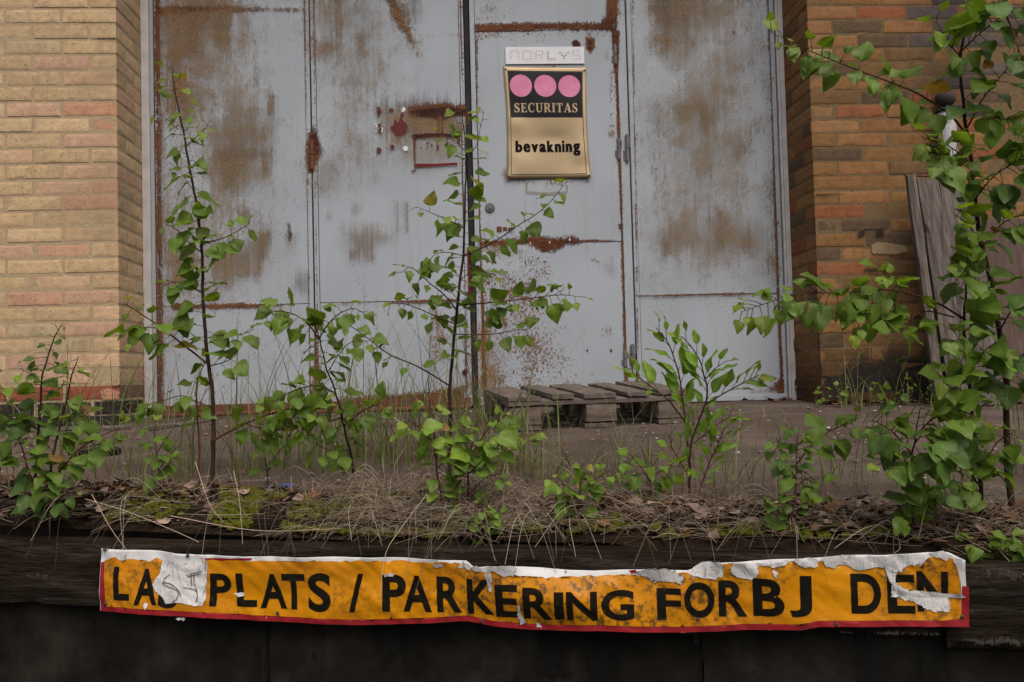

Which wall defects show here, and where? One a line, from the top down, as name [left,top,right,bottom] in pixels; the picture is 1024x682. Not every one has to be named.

corrosion [153,0,785,406]